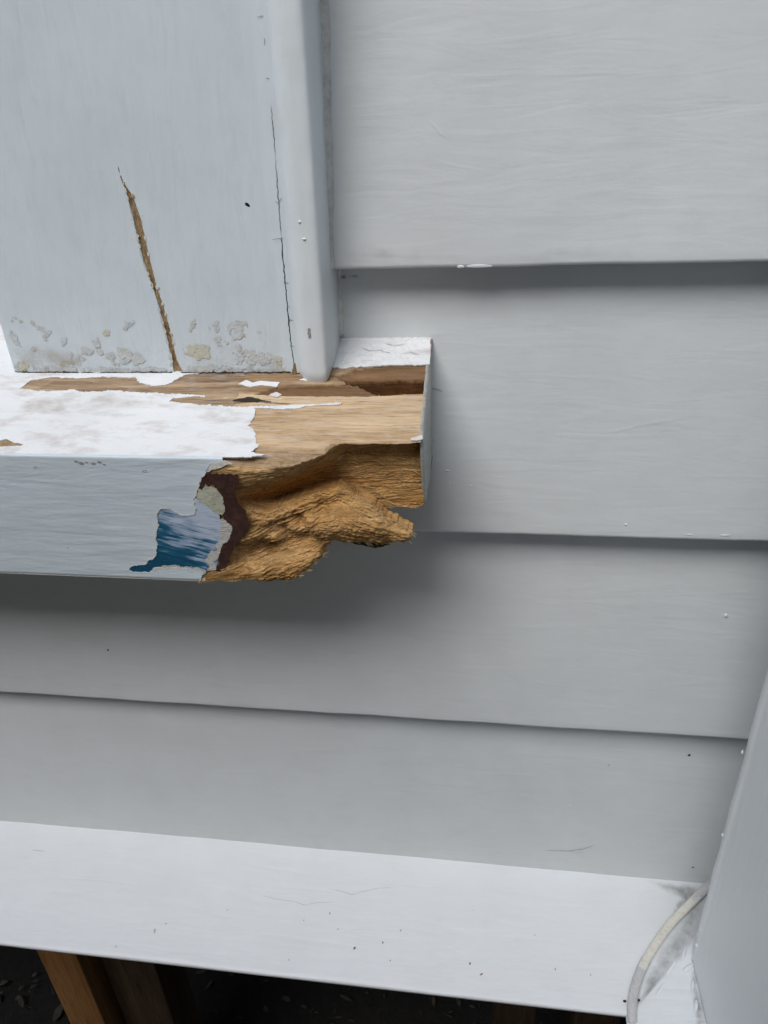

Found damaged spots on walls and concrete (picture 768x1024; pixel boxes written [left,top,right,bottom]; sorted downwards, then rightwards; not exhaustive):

crack [118,167,183,373]
crack [271,110,297,375]
peeling [8,316,166,373]
peeling [182,318,286,373]
peeling [129,460,249,581]